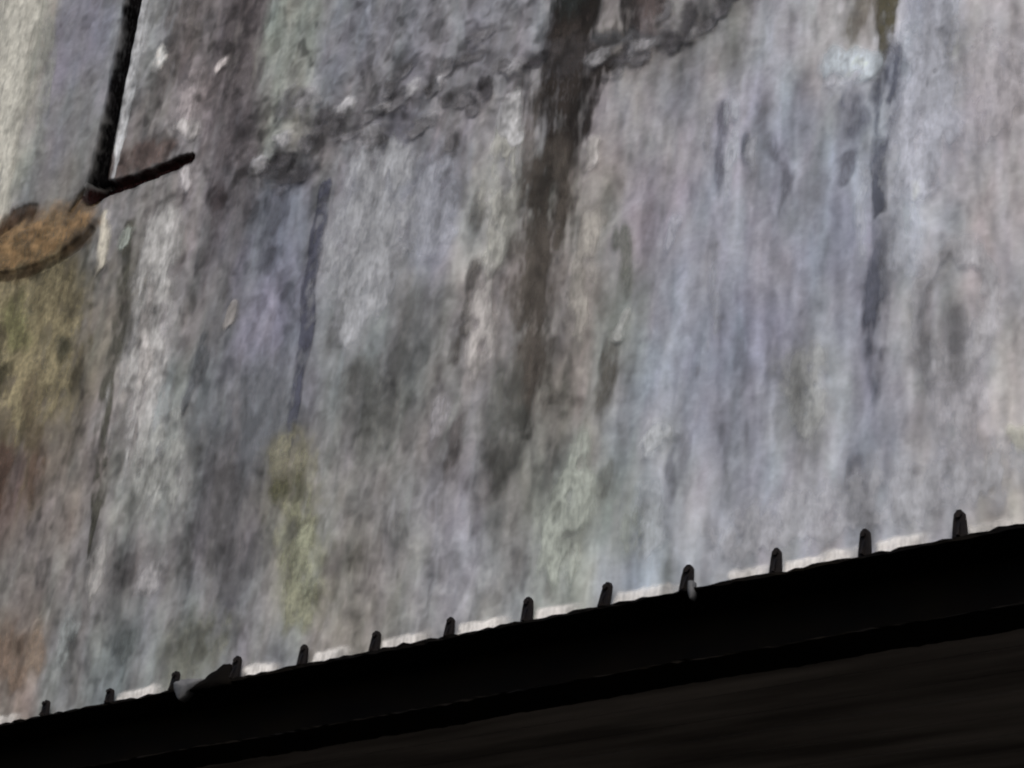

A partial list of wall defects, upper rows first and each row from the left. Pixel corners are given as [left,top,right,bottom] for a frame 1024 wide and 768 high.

rust [112,138,176,177]
water stain [823,0,960,230]
water stain [966,26,1024,142]
water stain [452,0,682,438]
water stain [860,208,919,351]
water stain [430,396,462,471]
water stain [643,423,671,456]
water stain [539,433,612,586]
water stain [621,481,662,552]